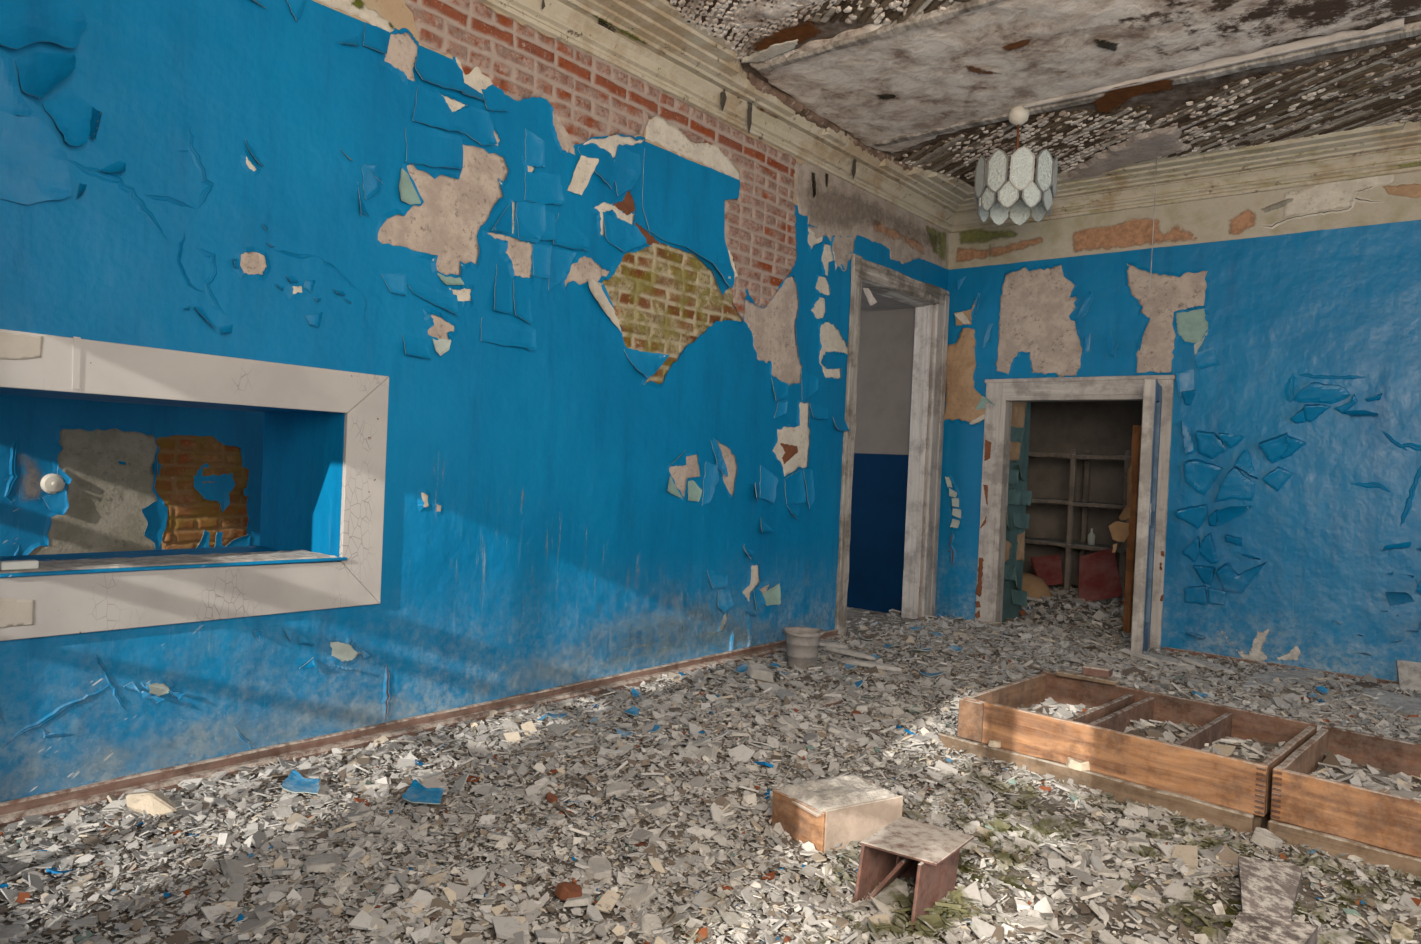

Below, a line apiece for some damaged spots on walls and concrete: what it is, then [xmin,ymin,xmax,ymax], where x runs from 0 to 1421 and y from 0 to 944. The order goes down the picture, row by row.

flaking render [240,139,264,176]
peeling [1261,174,1421,218]
flaking render [233,223,352,327]
flaking render [287,0,948,532]
flaking render [944,263,1120,461]
flaking render [1123,262,1220,397]
flaking render [22,425,252,555]
flaking render [944,474,964,531]
peeling [1004,402,1032,606]
flaking render [707,544,781,635]
peeling [975,558,984,622]